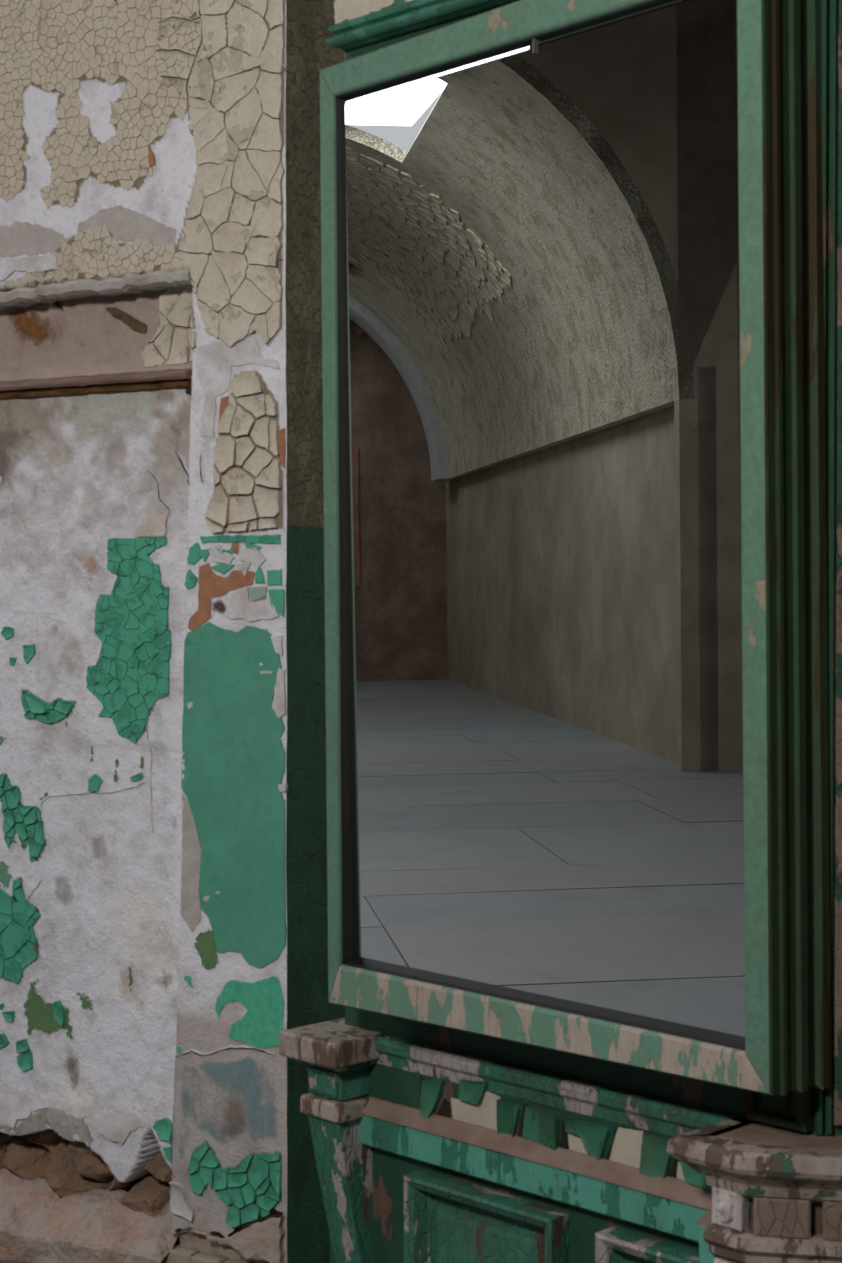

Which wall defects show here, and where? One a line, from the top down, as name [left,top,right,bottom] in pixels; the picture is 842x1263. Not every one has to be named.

crack [155,0,288,285]
peeling [0,0,286,630]
peeling [1,627,36,665]
peeling [21,692,76,723]
peeling [86,537,172,743]
spalling [260,635,287,718]
peeling [0,774,46,862]
spalling [180,792,220,933]
peeling [0,877,41,984]
peeling [0,1003,33,1072]
peeling [215,976,284,1049]
flaking render [0,1092,286,1263]